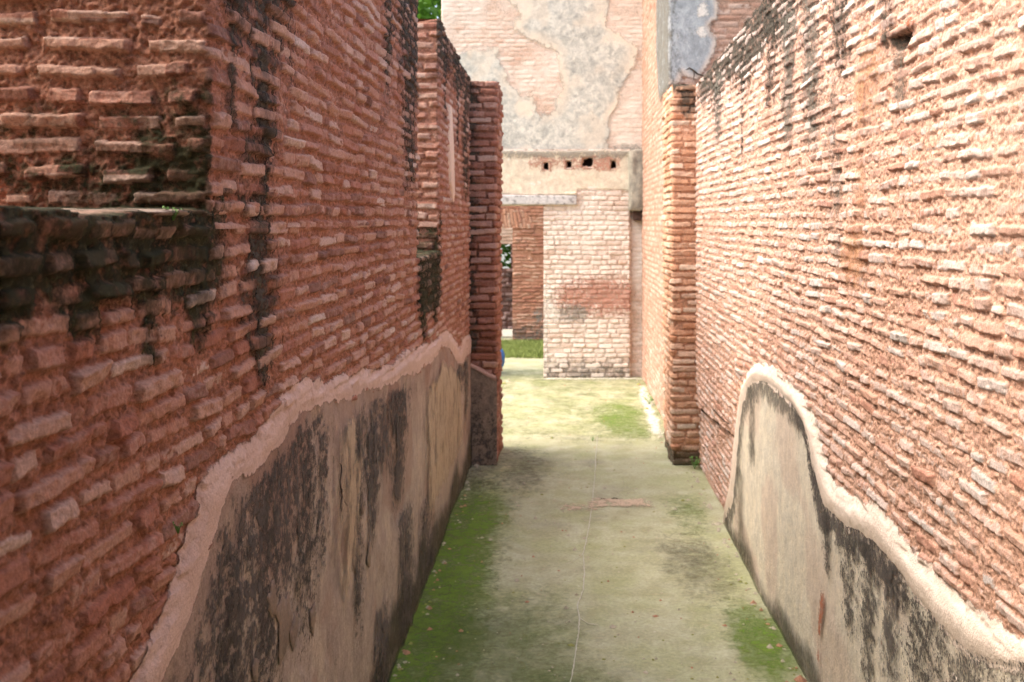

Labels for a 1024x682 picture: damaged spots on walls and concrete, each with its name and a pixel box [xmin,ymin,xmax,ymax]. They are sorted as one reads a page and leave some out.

water stain [0,0,303,386]
peeling [459,0,638,195]
water stain [655,0,851,249]
water stain [187,415,330,682]
water stain [352,383,497,682]
water stain [723,381,1024,682]